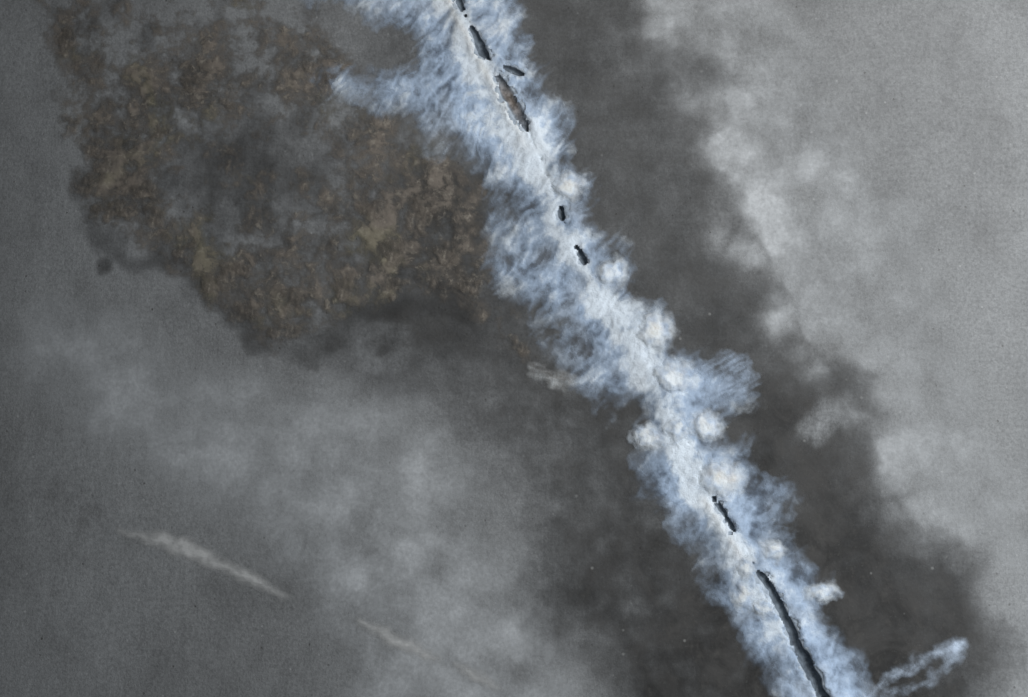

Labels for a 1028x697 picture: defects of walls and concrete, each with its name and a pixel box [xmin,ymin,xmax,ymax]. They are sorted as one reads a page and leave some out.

water stain [331,74,364,96]
crack [452,0,530,132]
crack [556,204,600,274]
water stain [358,0,988,697]
efflorescence [34,328,550,697]
crack [711,496,738,535]
crack [752,561,831,697]